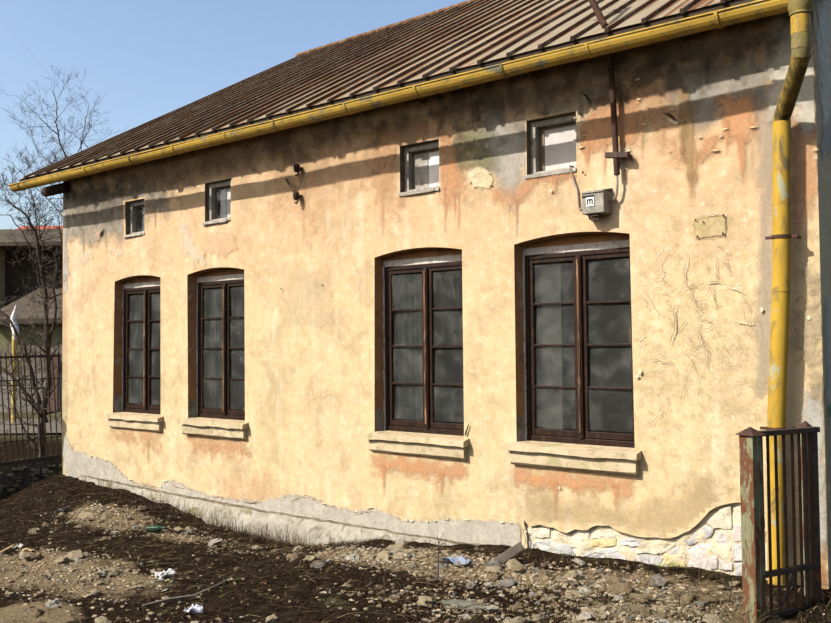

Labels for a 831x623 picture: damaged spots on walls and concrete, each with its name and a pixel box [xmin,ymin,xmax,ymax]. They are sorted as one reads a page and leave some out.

peeling [466,167,493,189]
damp [431,60,583,195]
damp [586,28,776,394]
peeling [697,96,758,172]
flaking render [766,12,791,121]
peeling [790,0,831,224]
crack [637,213,768,426]
spalling [525,503,742,576]